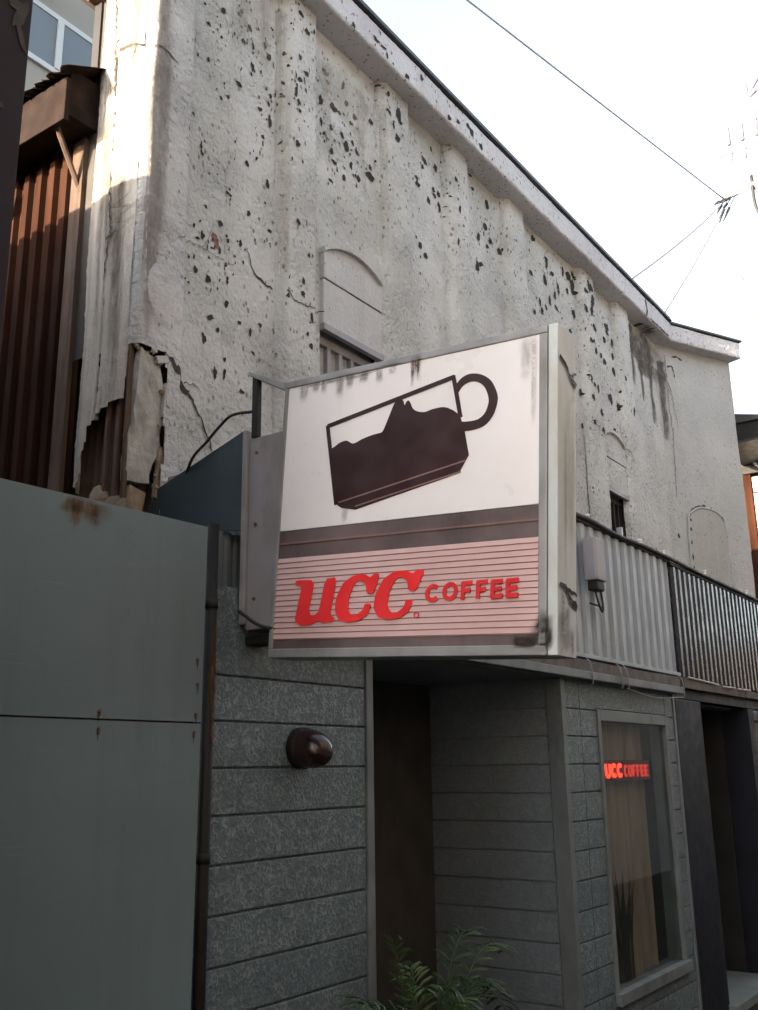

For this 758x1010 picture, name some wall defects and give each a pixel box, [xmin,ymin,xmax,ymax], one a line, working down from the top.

spalling [76,343,169,512]
crack [153,351,212,452]
rust [64,499,99,524]